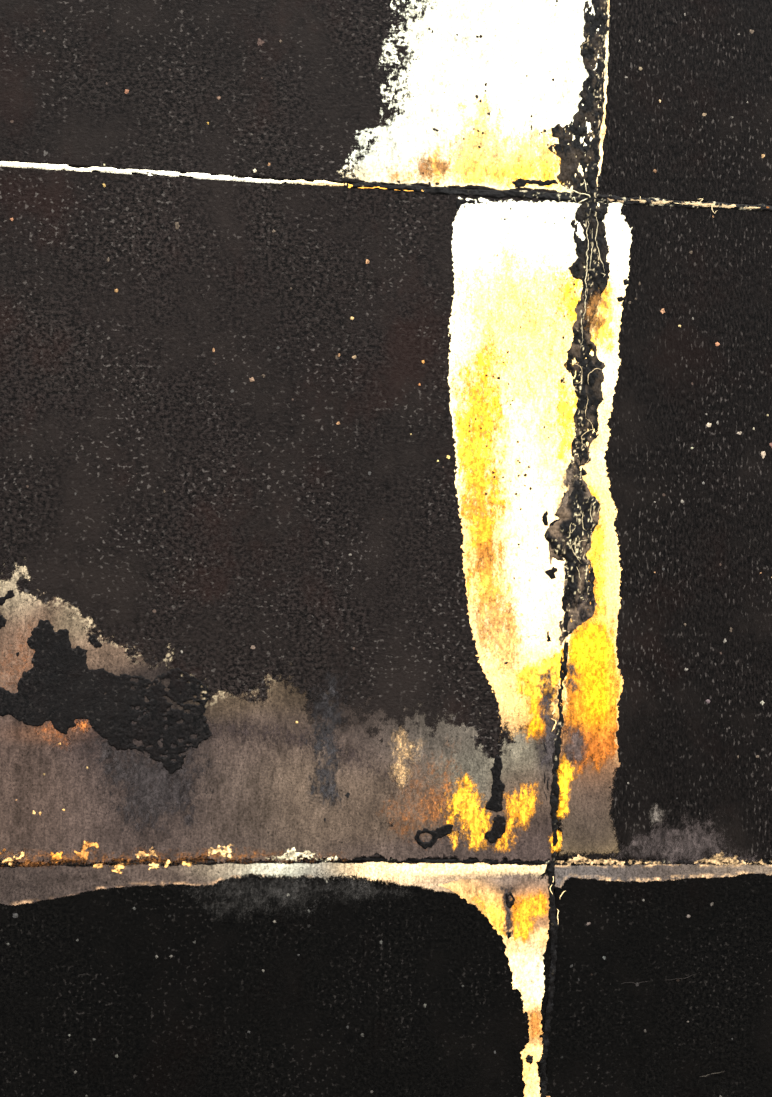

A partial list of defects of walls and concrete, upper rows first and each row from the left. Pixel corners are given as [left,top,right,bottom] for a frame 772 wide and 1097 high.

peeling [337,0,607,193]
rust [391,94,561,188]
rust [455,249,619,817]
crack [570,500,601,581]
peeling [0,196,637,1097]
water stain [93,731,213,835]
water stain [207,674,394,805]
water stain [271,847,338,861]
rust [403,775,490,849]
rust [496,783,537,849]
crack [543,690,566,799]
peeling [554,863,772,888]